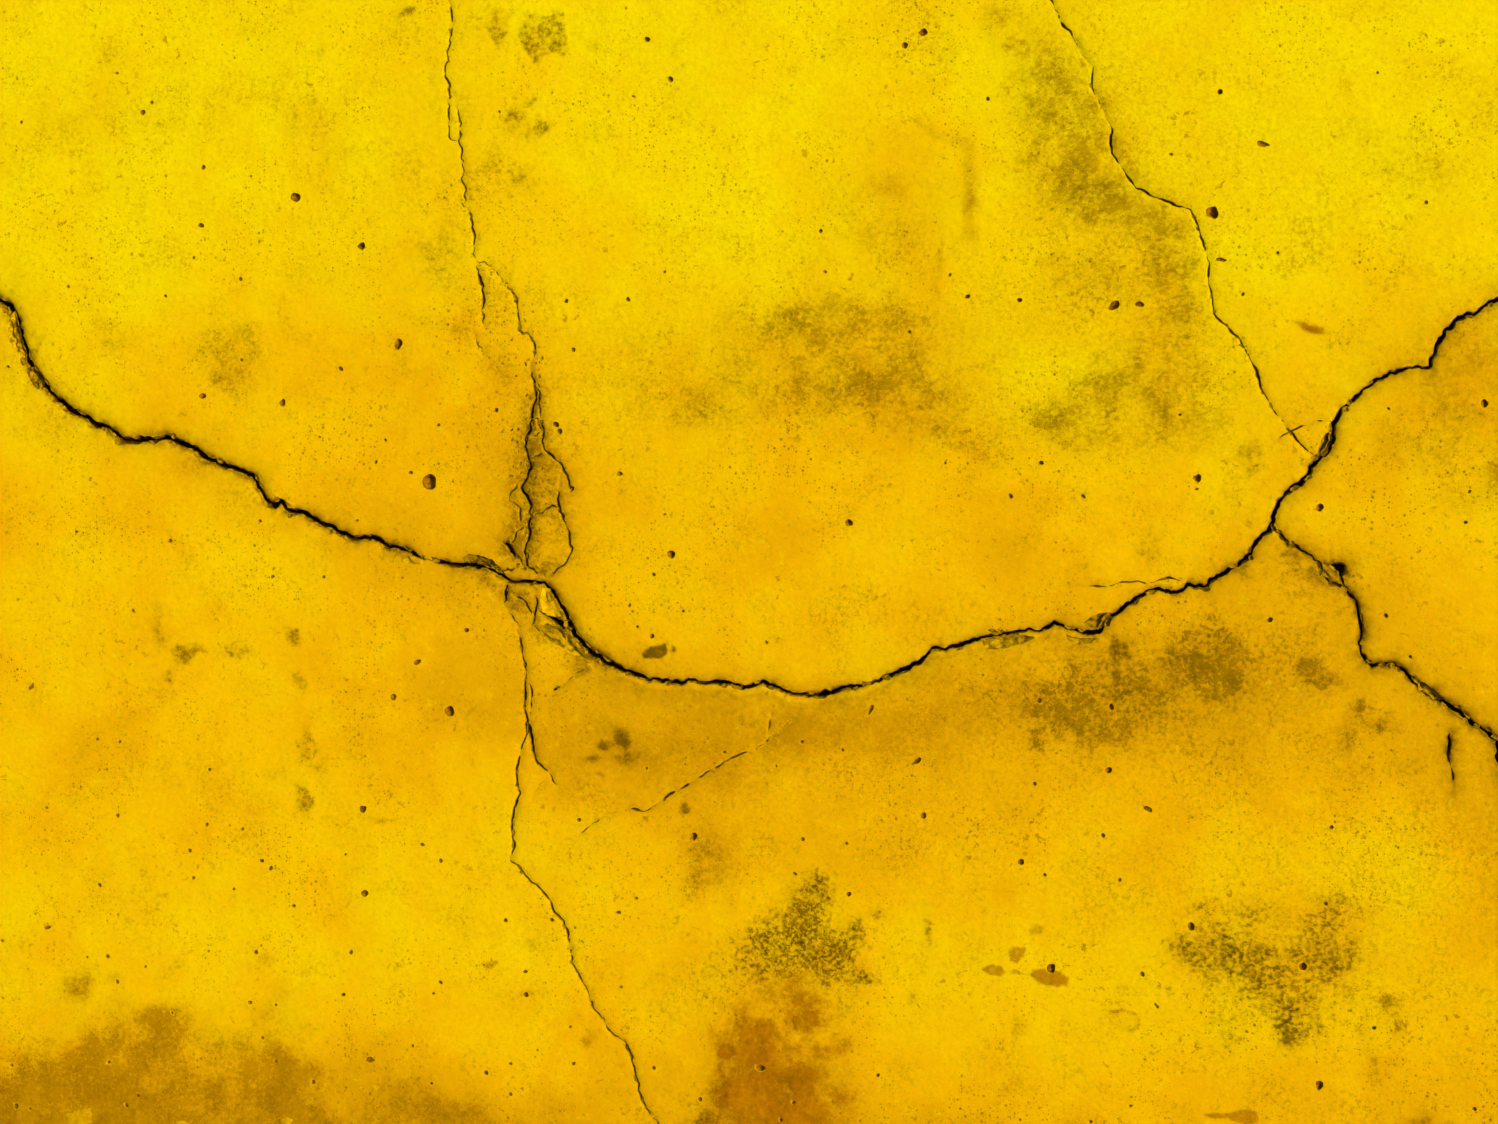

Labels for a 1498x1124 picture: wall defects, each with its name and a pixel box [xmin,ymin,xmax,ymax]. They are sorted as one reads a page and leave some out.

crack [0,0,1498,768]
crack [624,719,791,812]
crack [1446,733,1454,781]
crack [510,637,659,1124]
water stain [730,871,880,987]
water stain [1170,893,1355,1046]
water stain [0,1008,333,1124]